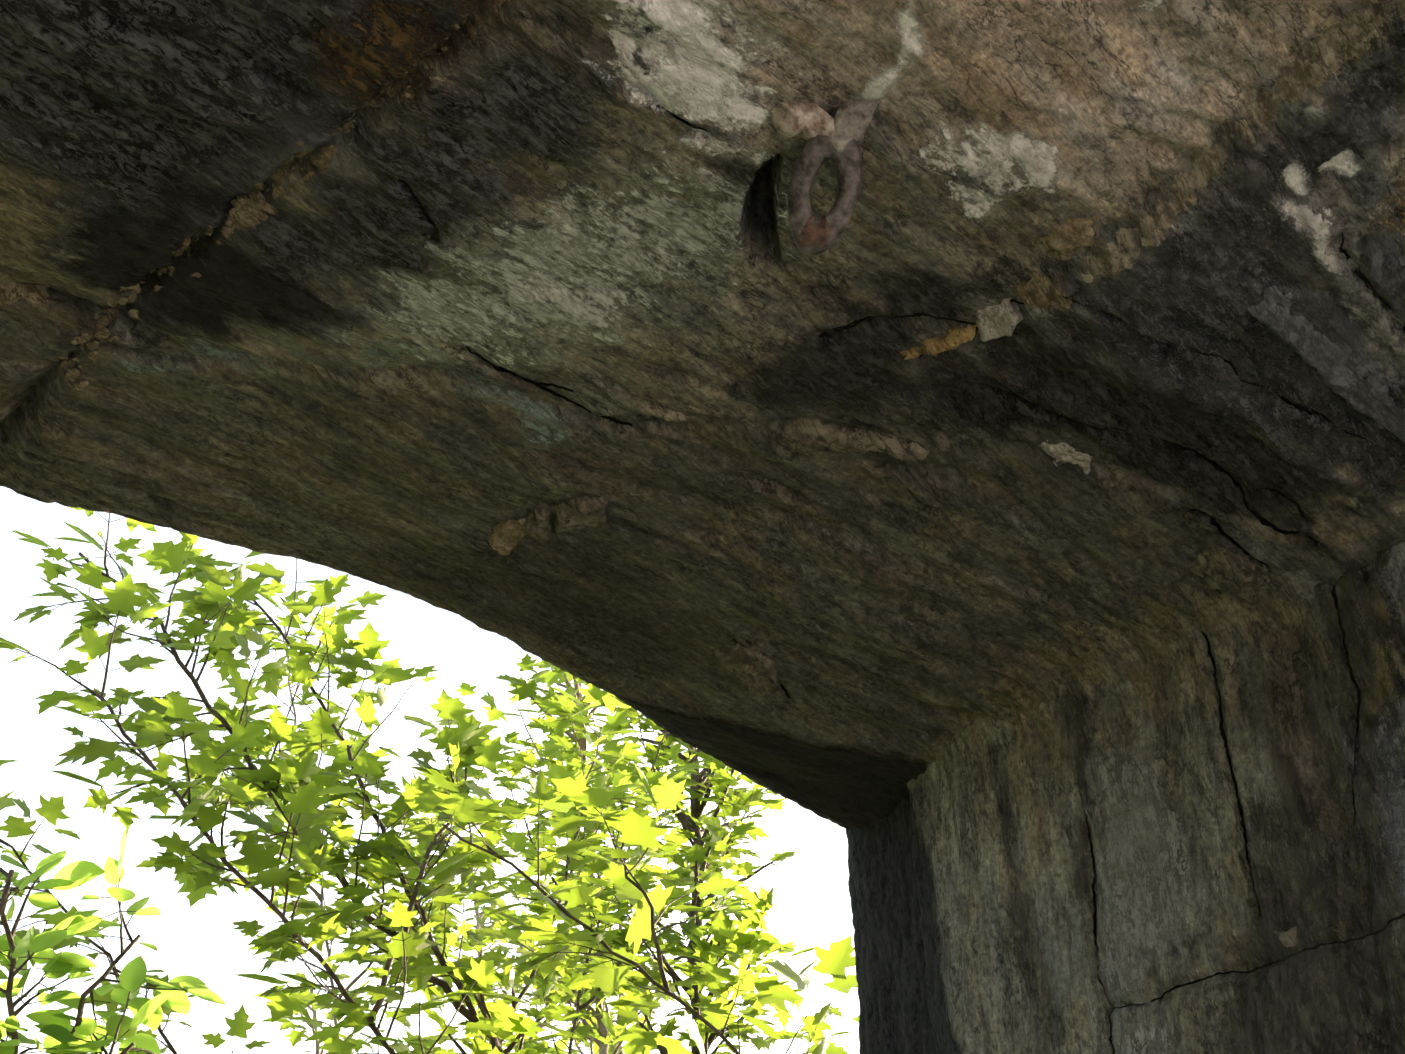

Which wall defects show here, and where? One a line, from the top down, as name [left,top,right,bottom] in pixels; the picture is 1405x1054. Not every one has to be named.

damp [861,3,922,101]
damp [919,124,1063,219]
crack [1339,232,1405,331]
crack [466,346,632,426]
crack [1331,585,1360,824]
crack [1202,631,1260,917]
crack [1086,817,1405,1054]